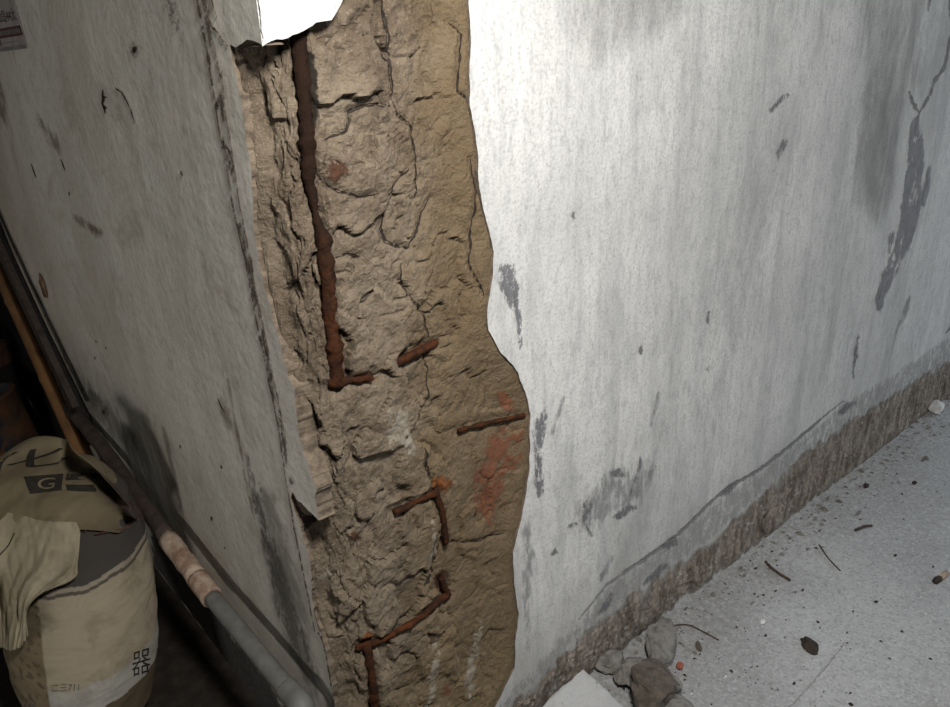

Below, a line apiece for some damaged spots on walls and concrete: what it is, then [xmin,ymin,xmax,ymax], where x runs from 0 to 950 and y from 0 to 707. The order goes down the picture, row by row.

corrosion [327,160,349,182]
crack [909,40,950,130]
crack [196,0,335,707]
spalling [234,0,950,707]
water stain [245,454,313,672]